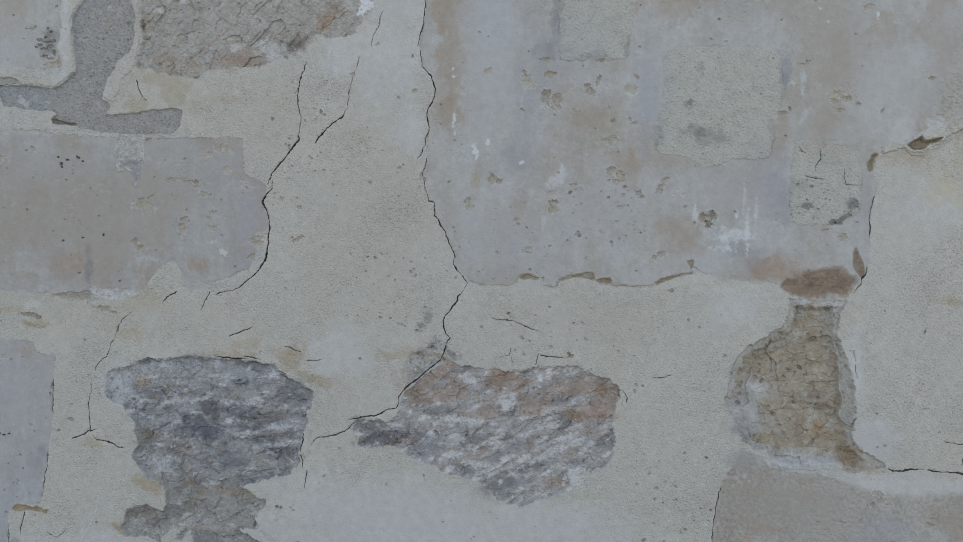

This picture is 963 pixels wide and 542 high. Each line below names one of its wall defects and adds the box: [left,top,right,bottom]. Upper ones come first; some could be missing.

spalling [0,0,377,142]
crack [202,19,381,308]
crack [300,2,466,488]
spalling [104,355,314,542]
spalling [353,335,645,508]
spalling [724,247,886,474]